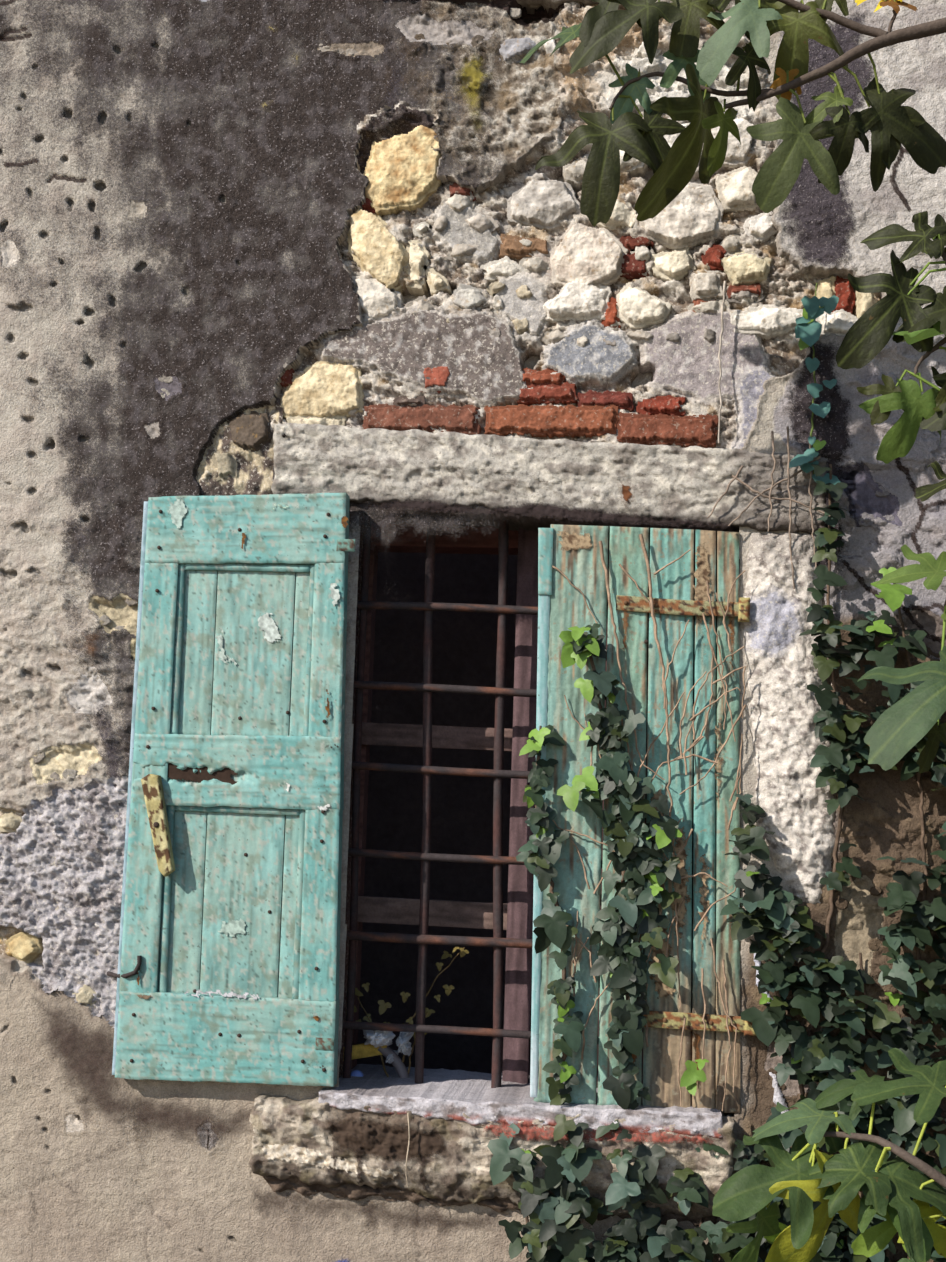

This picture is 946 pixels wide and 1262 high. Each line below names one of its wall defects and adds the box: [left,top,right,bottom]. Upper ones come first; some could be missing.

water stain [0,0,509,602]
spalling [196,2,881,513]
water stain [63,593,136,820]
peeling [169,497,187,528]
crack [842,560,944,643]
crack [895,457,946,554]
spalling [0,743,128,1028]
water stain [49,1012,251,1135]